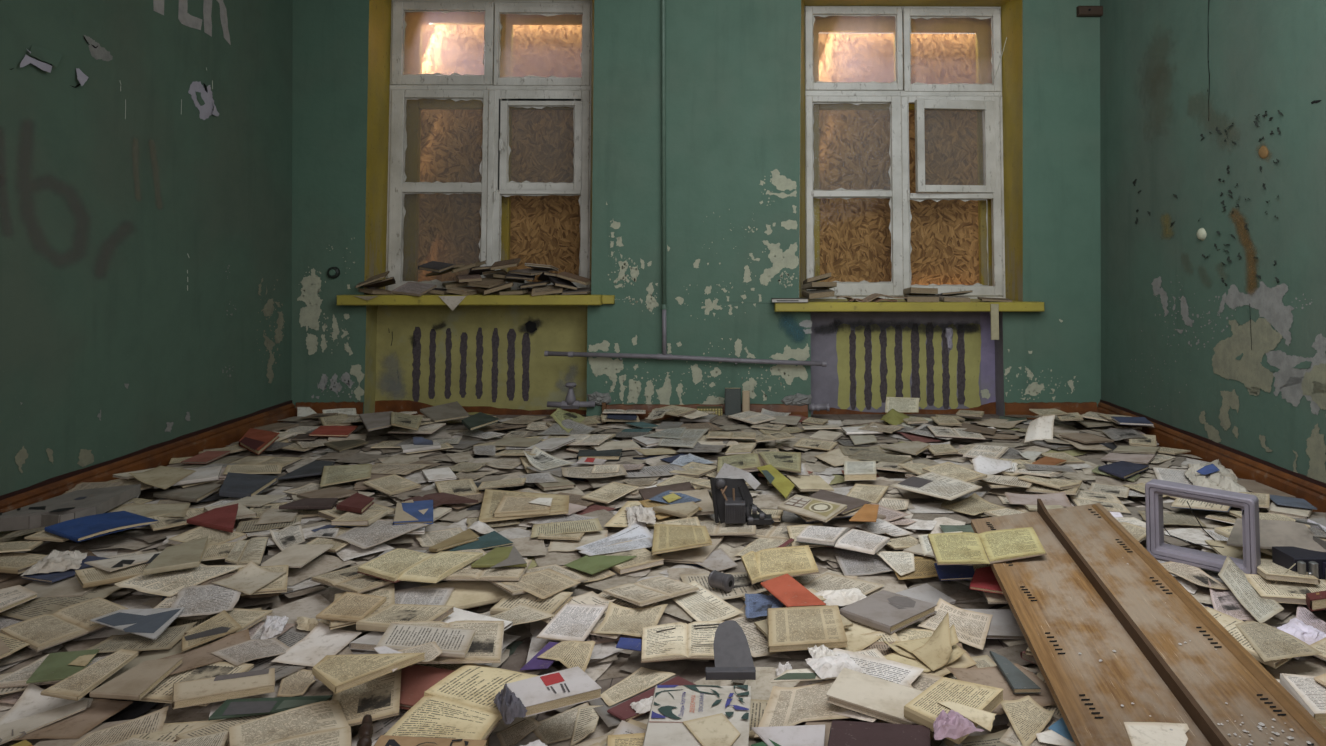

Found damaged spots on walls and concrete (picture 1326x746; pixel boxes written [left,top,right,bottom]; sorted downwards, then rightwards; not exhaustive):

spalling [84,35,113,61]
peeling [188,81,219,120]
peeling [606,202,659,314]
peeling [675,169,799,320]
rust [1231,209,1256,293]
peeling [256,267,365,400]
peeling [587,320,812,406]
peeling [1130,224,1326,483]